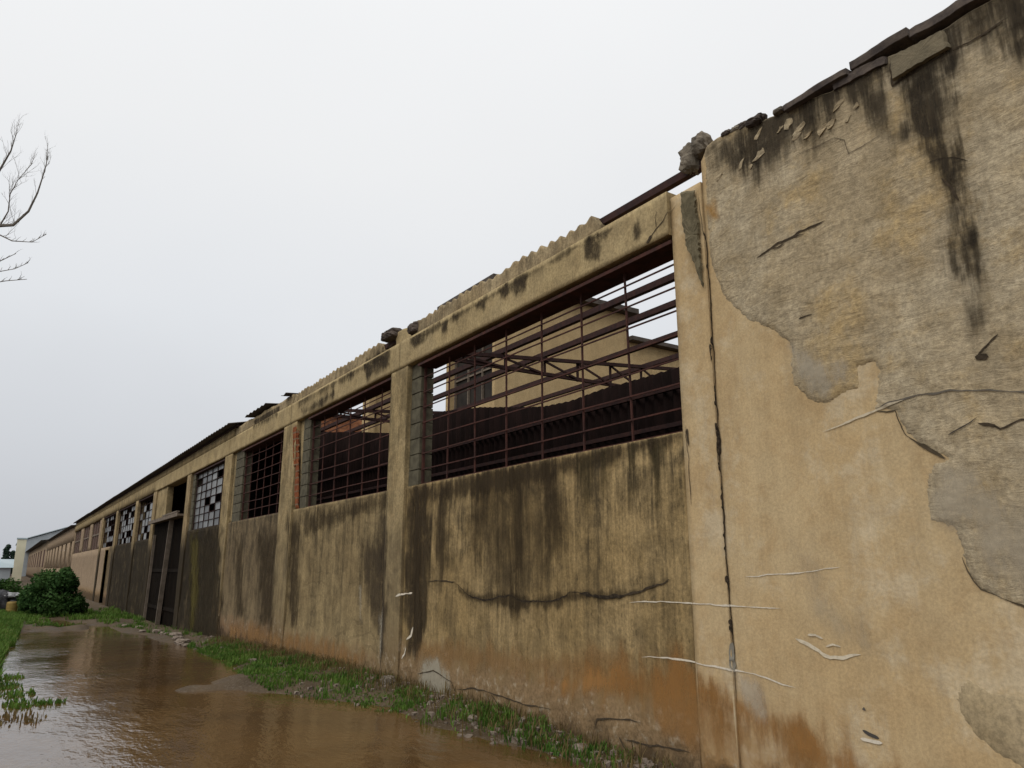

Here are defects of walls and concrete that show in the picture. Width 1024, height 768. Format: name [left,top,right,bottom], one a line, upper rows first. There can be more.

water stain [720,0,1024,200]
water stain [500,275,527,297]
water stain [584,230,609,259]
crack [757,220,825,258]
flaking render [680,0,1024,608]
water stain [348,345,392,380]
crack [698,195,736,688]
crack [823,389,1024,459]
water stain [188,529,223,636]
water stain [258,495,386,655]
water stain [404,433,679,693]
crack [429,579,669,602]